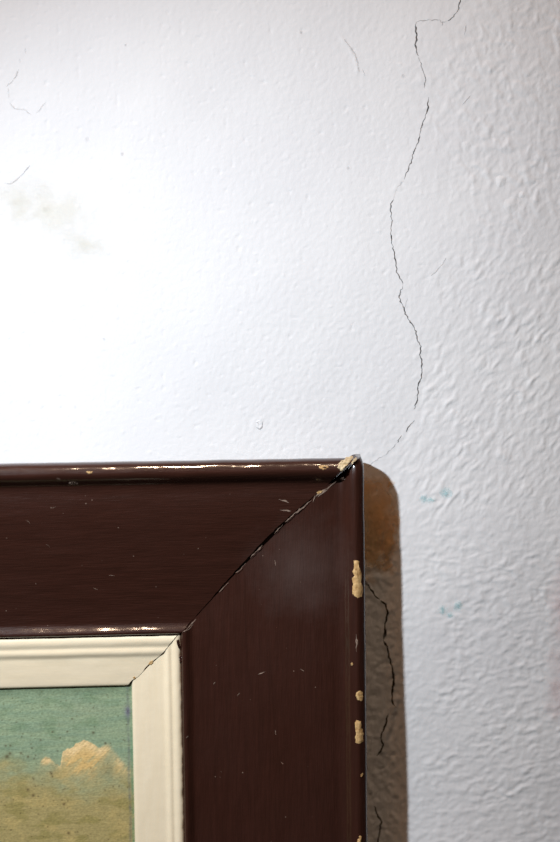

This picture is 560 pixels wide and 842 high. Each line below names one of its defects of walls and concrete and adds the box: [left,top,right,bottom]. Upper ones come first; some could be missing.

crack [405,0,461,176]
crack [390,199,422,440]
crack [365,581,396,756]
crack [374,806,382,842]